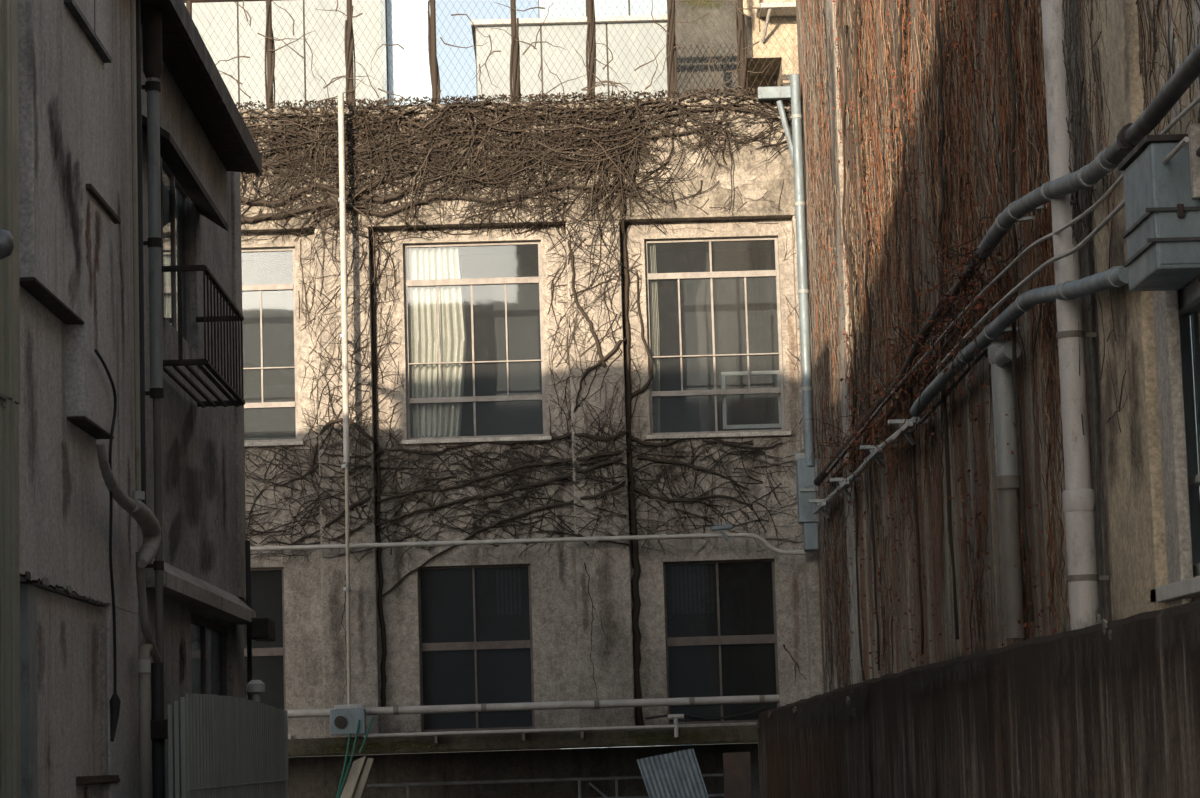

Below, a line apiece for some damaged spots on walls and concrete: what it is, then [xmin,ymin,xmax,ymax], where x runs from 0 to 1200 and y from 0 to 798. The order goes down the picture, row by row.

damp [49,106,80,279]
peeling [605,150,708,195]
peeling [716,167,768,200]
corrosion [86,201,99,344]